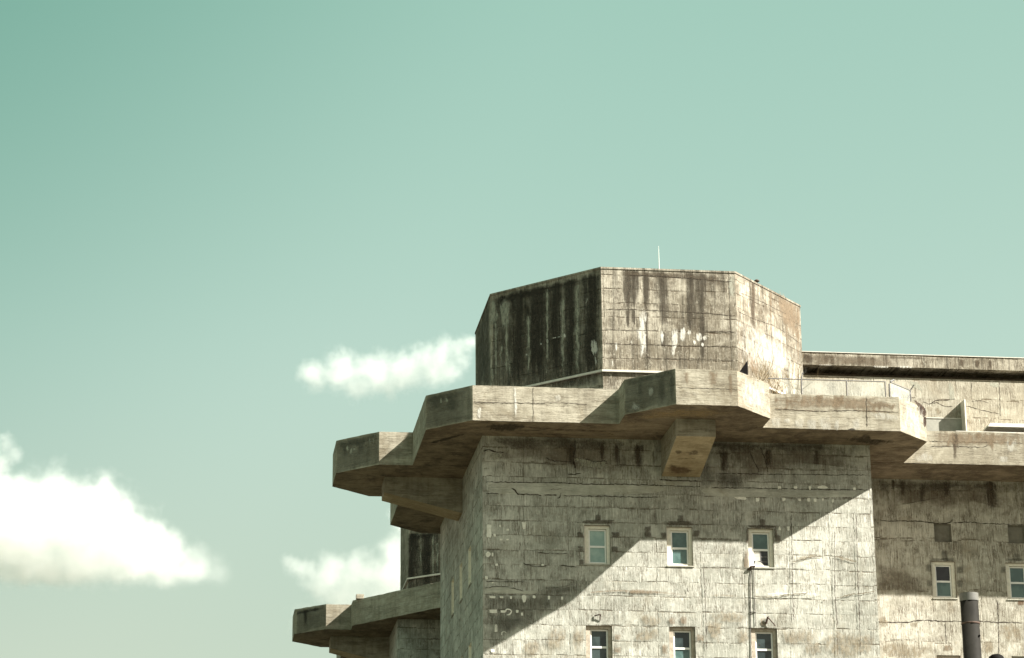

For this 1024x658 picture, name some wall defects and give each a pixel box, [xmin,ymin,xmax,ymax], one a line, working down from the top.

water stain [624,269,735,357]
water stain [479,276,599,452]
crack [486,441,870,498]
water stain [892,481,996,506]
water stain [409,534,438,586]